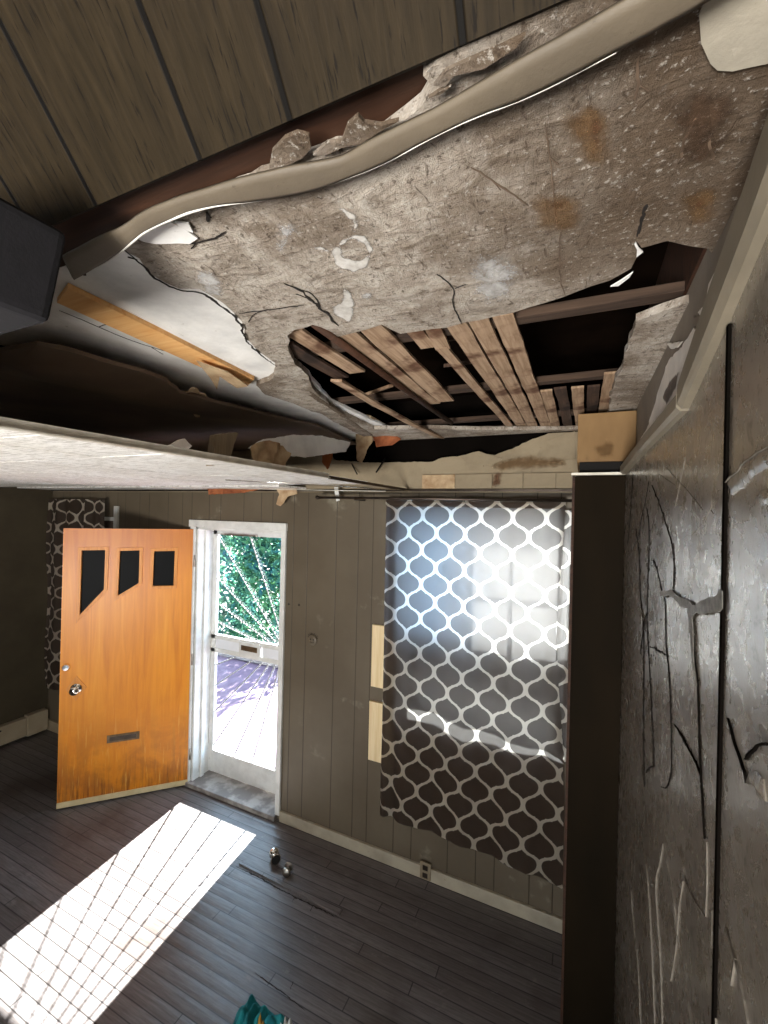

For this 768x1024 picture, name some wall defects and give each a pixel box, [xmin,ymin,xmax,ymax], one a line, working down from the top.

leakage [537,197,576,229]
crack [125,250,339,367]
peeling [641,327,696,438]
peeling [460,451,502,467]
crack [627,475,706,839]
crack [726,718,768,783]